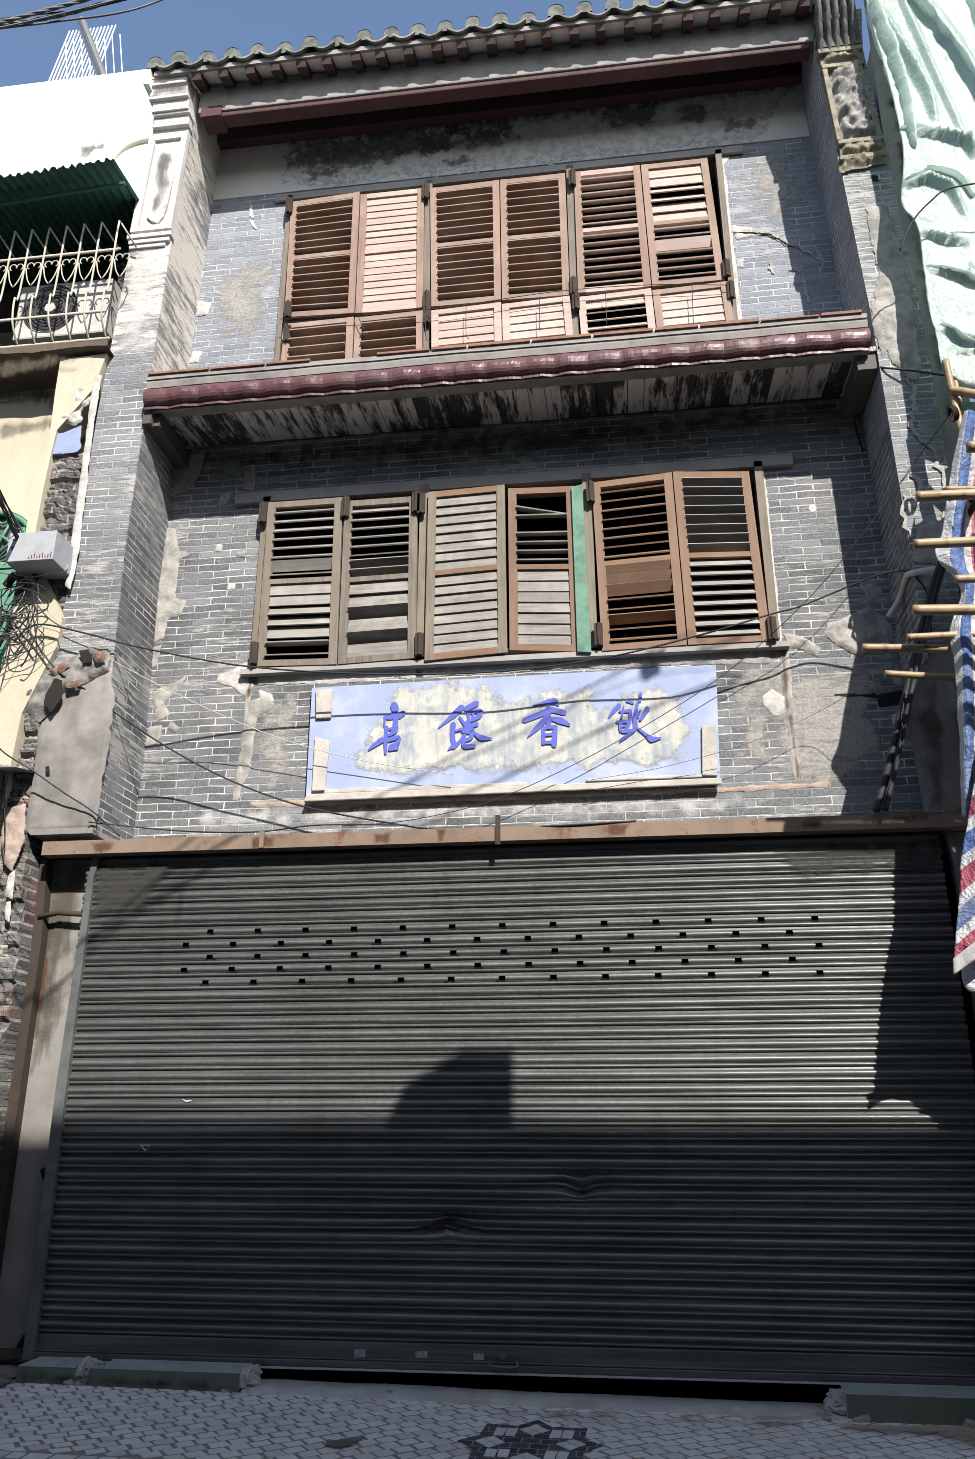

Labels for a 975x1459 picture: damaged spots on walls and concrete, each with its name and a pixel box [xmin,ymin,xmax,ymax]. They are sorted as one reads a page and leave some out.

crack [732,227,824,303]
flaking render [26,645,111,722]
peeling [217,662,274,787]
flaking render [783,581,907,731]